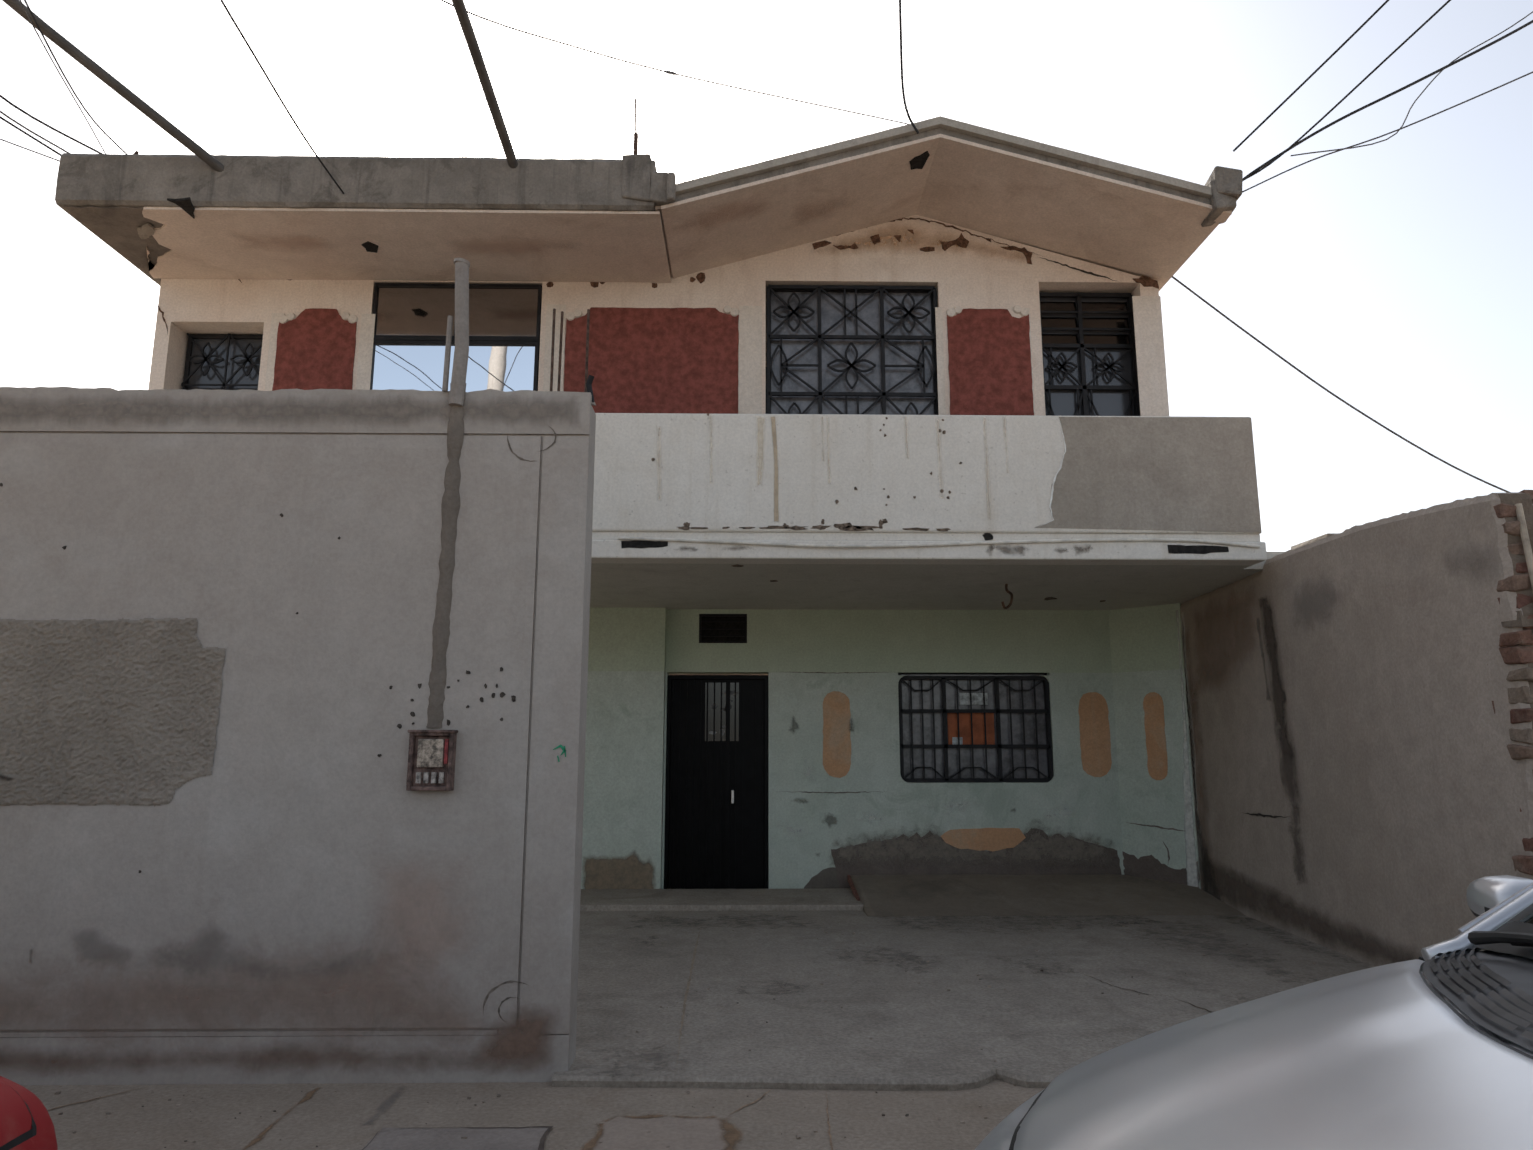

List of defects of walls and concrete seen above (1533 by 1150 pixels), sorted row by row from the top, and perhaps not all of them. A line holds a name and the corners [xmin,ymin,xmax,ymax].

peeling [1034,417,1262,533]
leakage [1257,599,1304,880]
leakage [1190,680,1413,963]